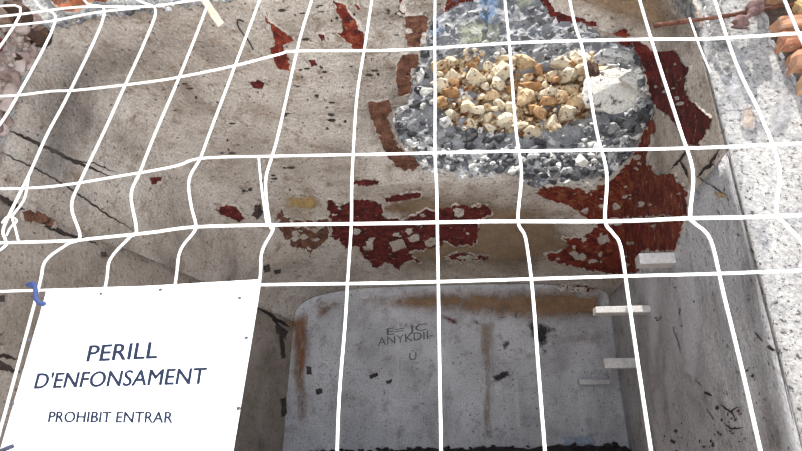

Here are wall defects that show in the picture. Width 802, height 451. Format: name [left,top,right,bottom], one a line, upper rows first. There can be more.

spalling [40,0,233,29]
peeling [259,0,367,87]
peeling [248,76,268,90]
crack [10,130,117,176]
crack [0,152,135,232]
crack [43,225,99,245]
peeling [212,201,264,222]
peeling [275,177,493,271]
peeling [366,0,714,275]
crack [671,149,728,197]
rust [396,293,599,317]
rust [292,317,307,388]